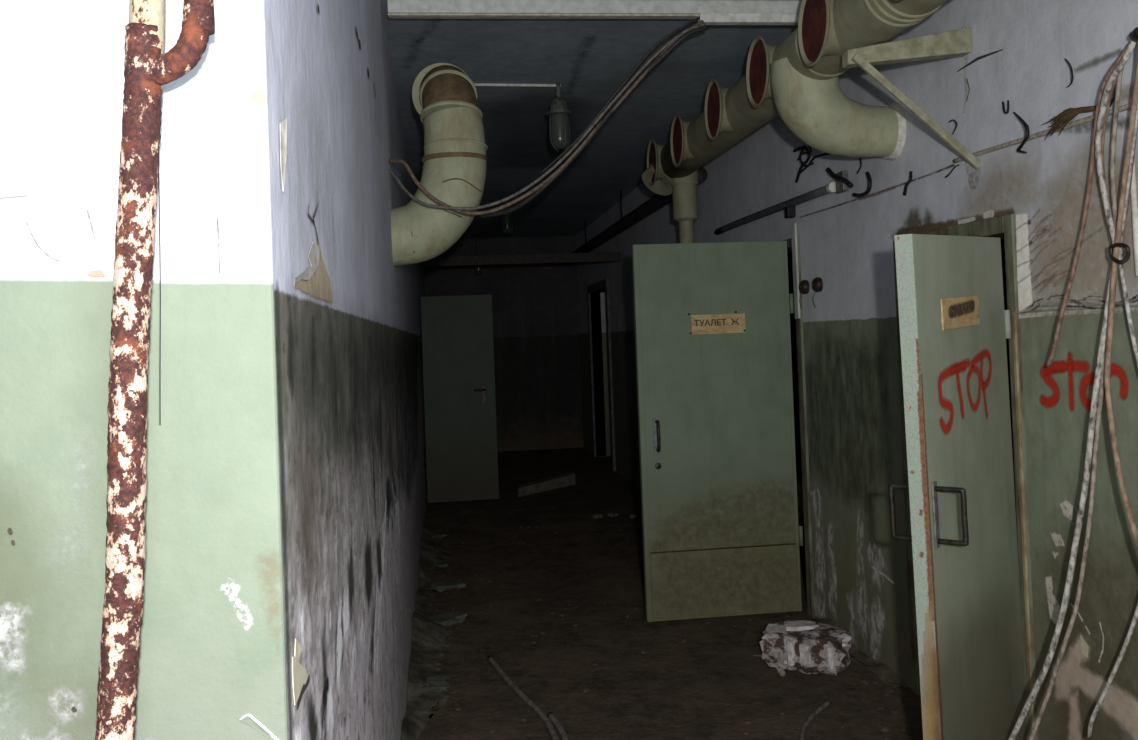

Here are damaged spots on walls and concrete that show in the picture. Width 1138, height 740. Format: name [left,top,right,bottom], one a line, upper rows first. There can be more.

leakage [1040,162,1138,292]
leakage [277,289,418,740]
corrosion [911,339,944,740]
leakage [0,604,26,671]
leakage [50,693,83,740]
peeling [1053,635,1138,740]